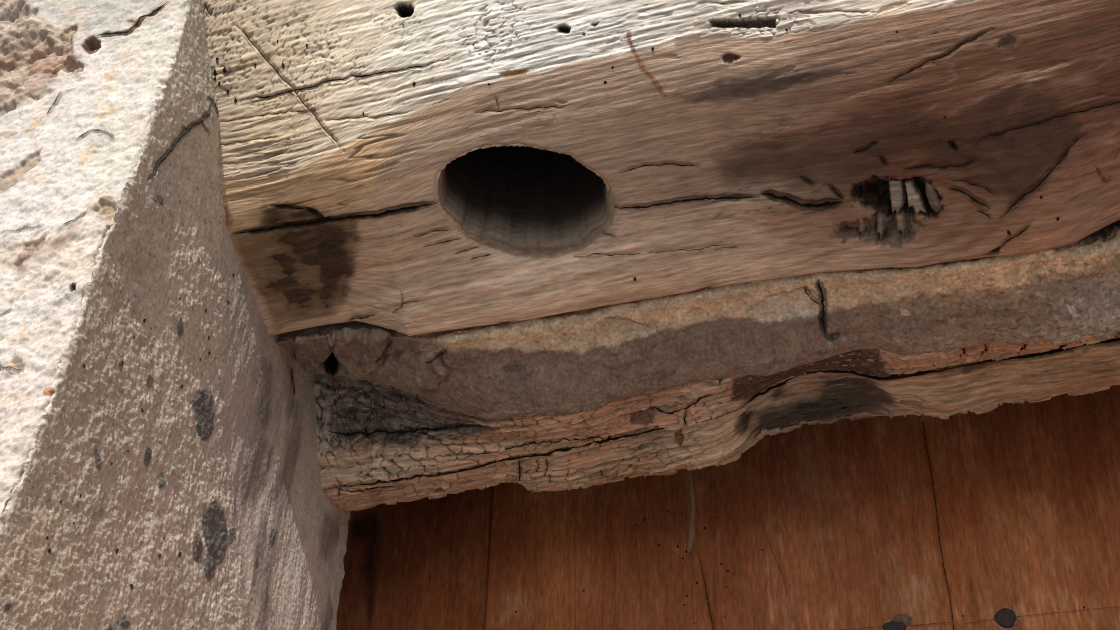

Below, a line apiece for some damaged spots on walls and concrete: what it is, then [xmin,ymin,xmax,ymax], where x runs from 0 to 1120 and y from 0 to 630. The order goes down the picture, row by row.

crack [97,2,167,36]
crack [150,3,449,179]
spalling [835,175,942,247]
water stain [239,221,356,321]
water stain [191,387,215,441]
water stain [731,341,892,433]
water stain [193,500,236,582]
water stain [254,508,281,627]